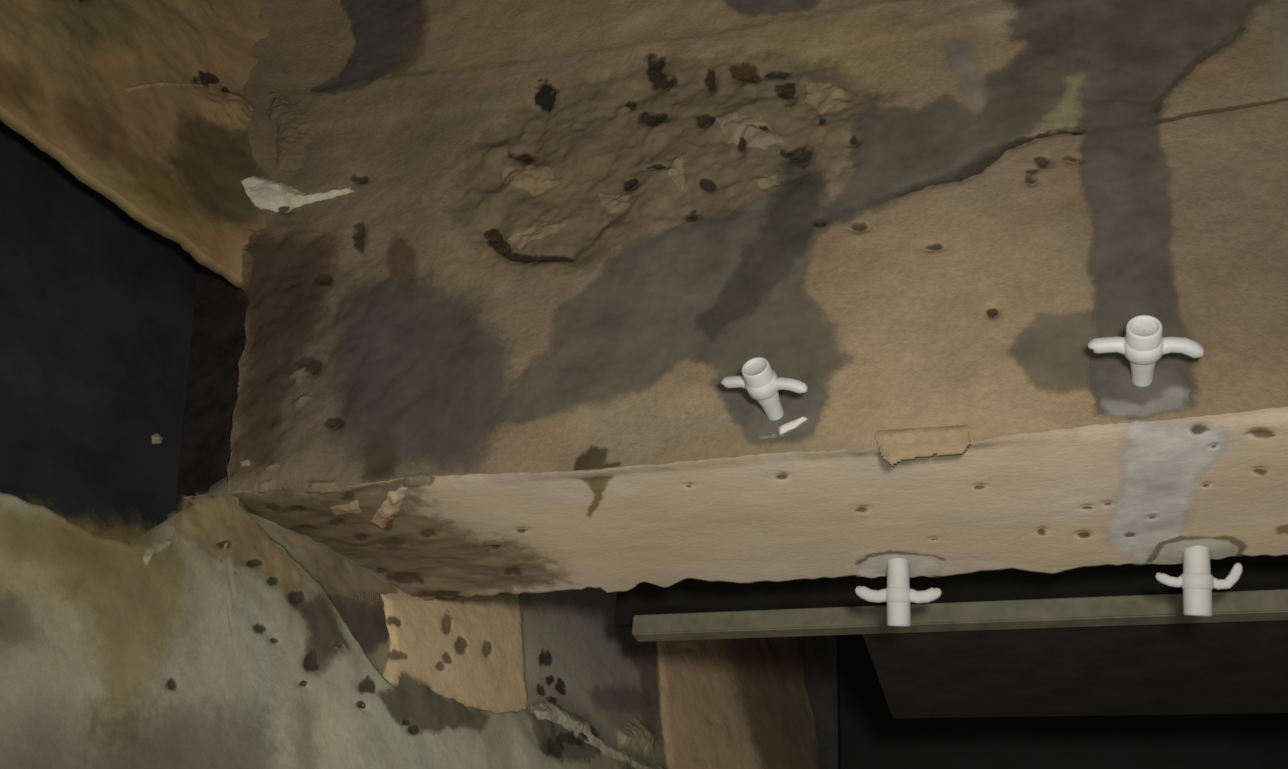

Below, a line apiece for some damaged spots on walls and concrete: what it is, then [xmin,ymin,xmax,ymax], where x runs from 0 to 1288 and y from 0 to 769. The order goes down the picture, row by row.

leakage [310,0,425,94]
spalling [626,102,668,126]
spalling [647,54,677,89]
spalling [704,63,854,124]
crack [889,27,1288,200]
flaking render [242,176,368,214]
spalling [497,154,569,198]
spalling [592,151,716,219]
spalling [696,109,812,195]
leakage [342,0,1288,477]
flaking render [874,425,971,467]
spalling [527,701,669,769]